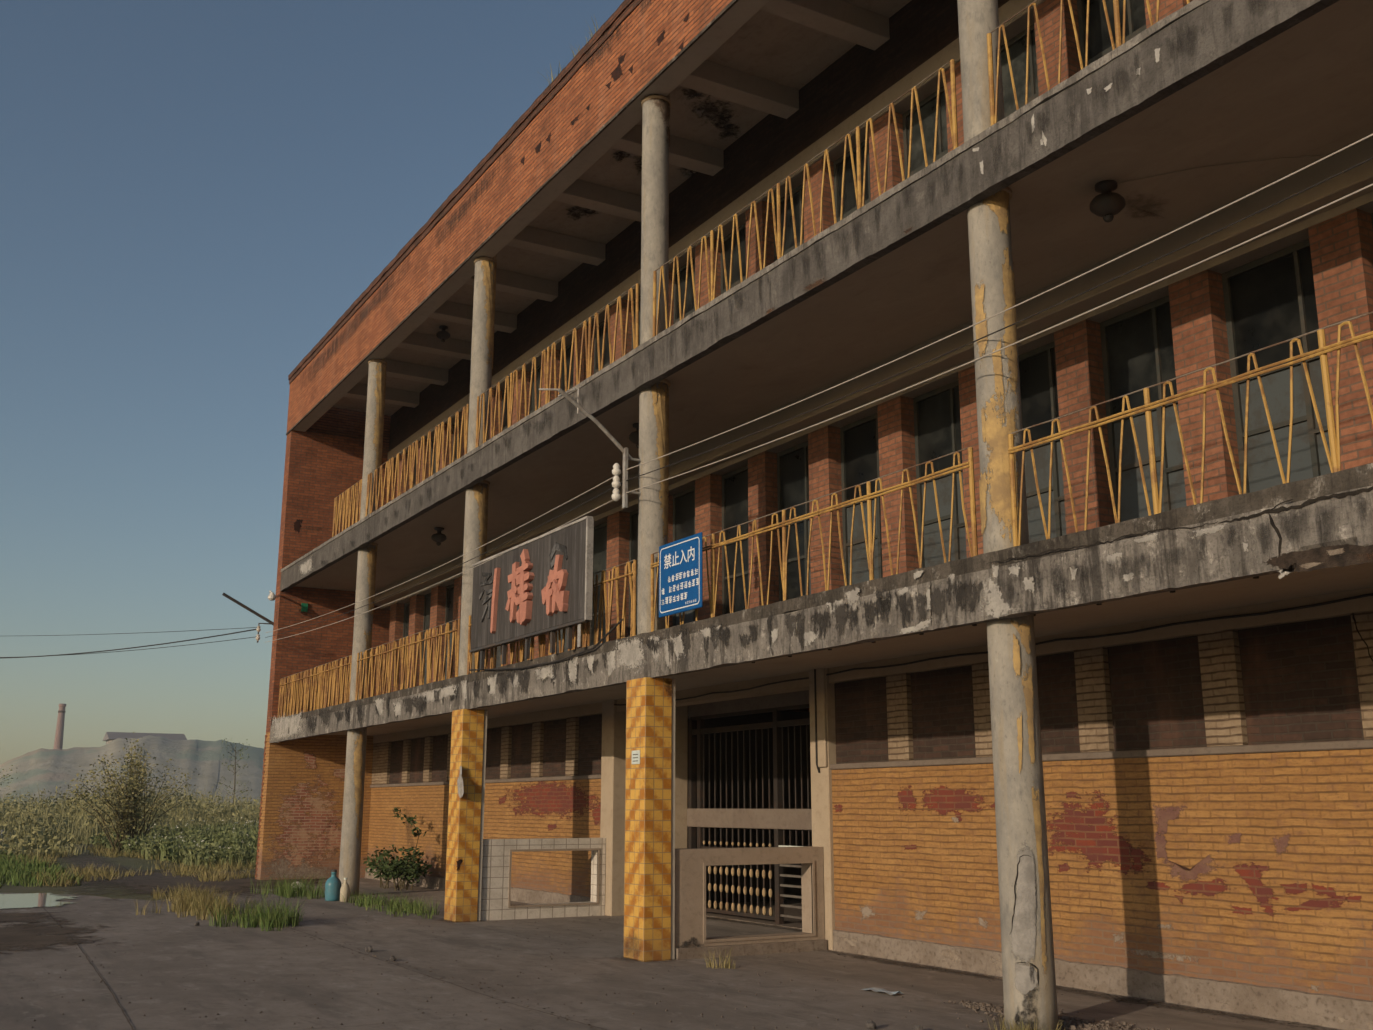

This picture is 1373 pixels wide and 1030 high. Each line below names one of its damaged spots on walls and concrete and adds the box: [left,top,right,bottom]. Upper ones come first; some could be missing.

leakage [683,89,740,139]
peeling [975,190,1020,543]
peeling [1134,534,1158,543]
crack [986,486,1373,564]
peeling [1190,523,1226,539]
leakage [1260,517,1299,552]
peeling [1106,552,1134,581]
leakage [647,578,982,663]
peeling [484,781,601,831]
peeling [897,785,995,822]
peeling [979,564,1362,995]
crack [1009,855,1039,984]